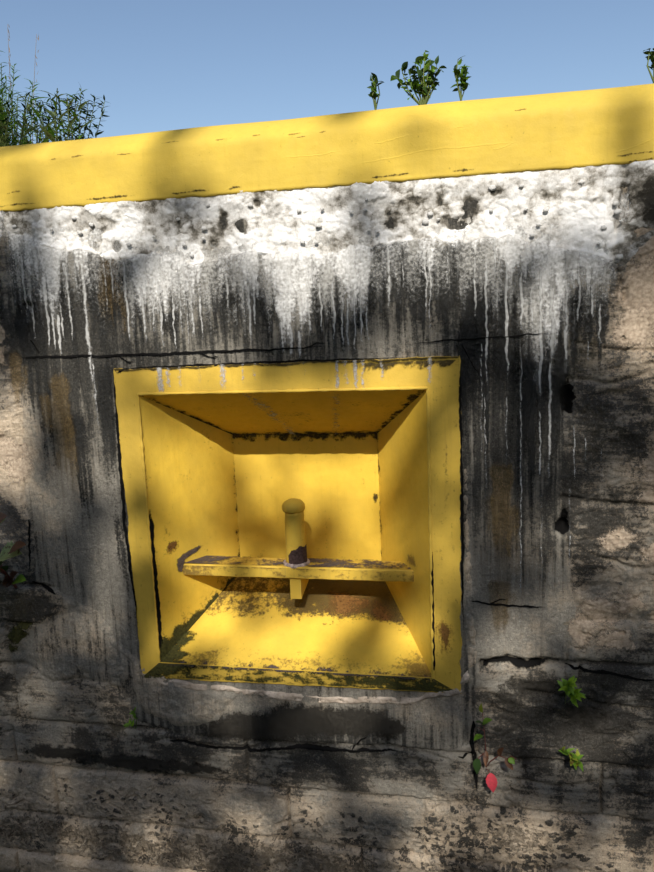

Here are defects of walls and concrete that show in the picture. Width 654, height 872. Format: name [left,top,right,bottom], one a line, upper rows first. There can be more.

leakage [0,206,613,564]
crack [419,333,543,628]
leakage [114,514,129,595]
rust [288,545,307,565]
rust [436,623,450,650]